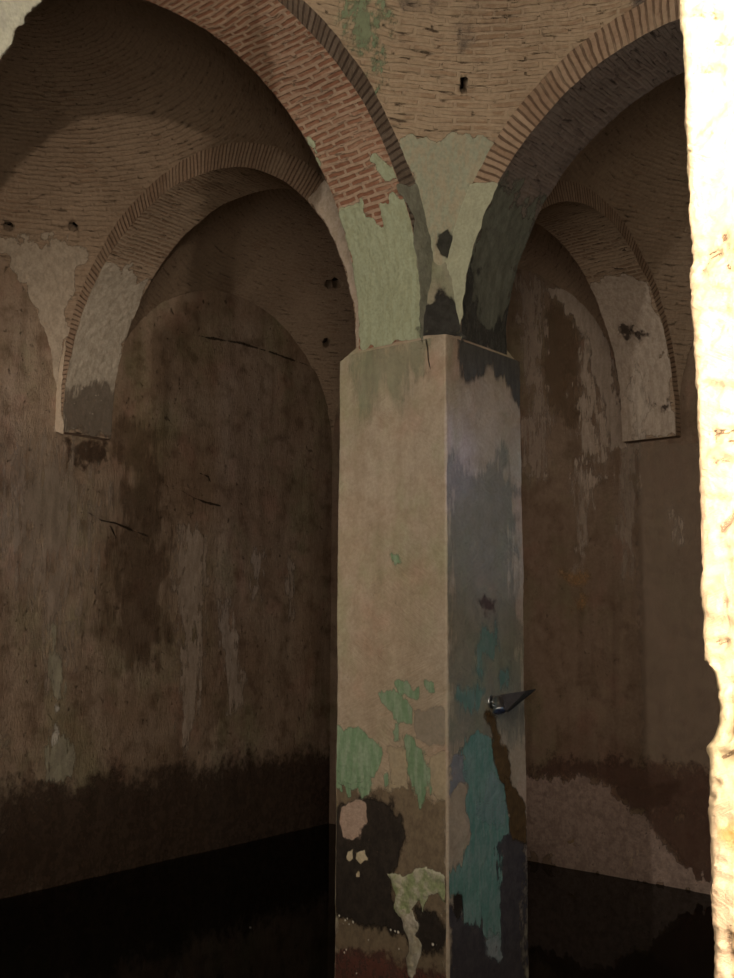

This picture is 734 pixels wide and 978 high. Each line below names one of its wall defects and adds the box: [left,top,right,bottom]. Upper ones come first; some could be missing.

flaking render [0,232,148,434]
crack [182,332,304,364]
flaking render [308,132,498,350]
damp [618,323,649,340]
damp [0,381,115,712]
crack [89,513,148,538]
flaking render [339,799,368,840]
damp [0,523,712,978]